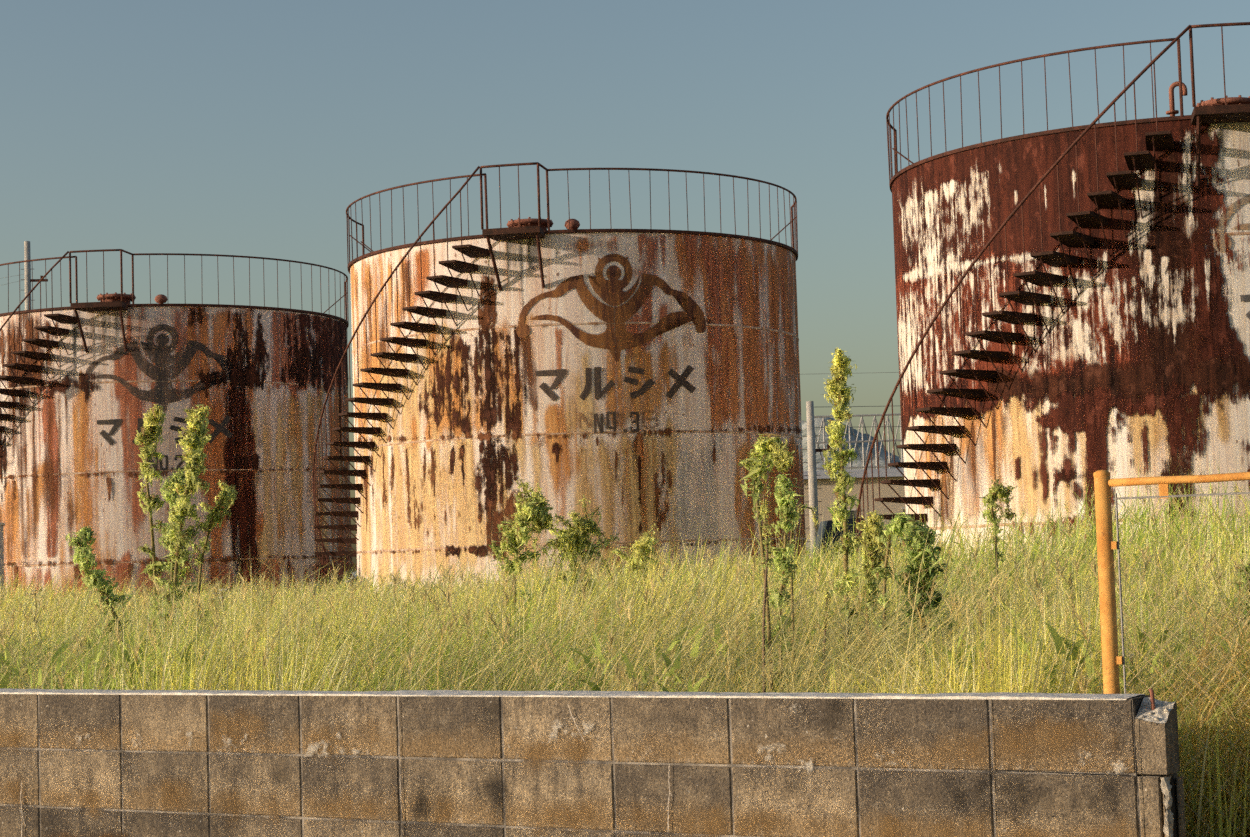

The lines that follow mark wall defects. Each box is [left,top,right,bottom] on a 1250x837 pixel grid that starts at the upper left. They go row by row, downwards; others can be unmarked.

corrosion [0,250,718,607]
corrosion [576,238,589,257]
corrosion [638,234,806,576]
peeling [898,168,1210,394]
corrosion [892,120,1250,540]
peeling [1179,133,1194,235]
water stain [307,733,359,756]